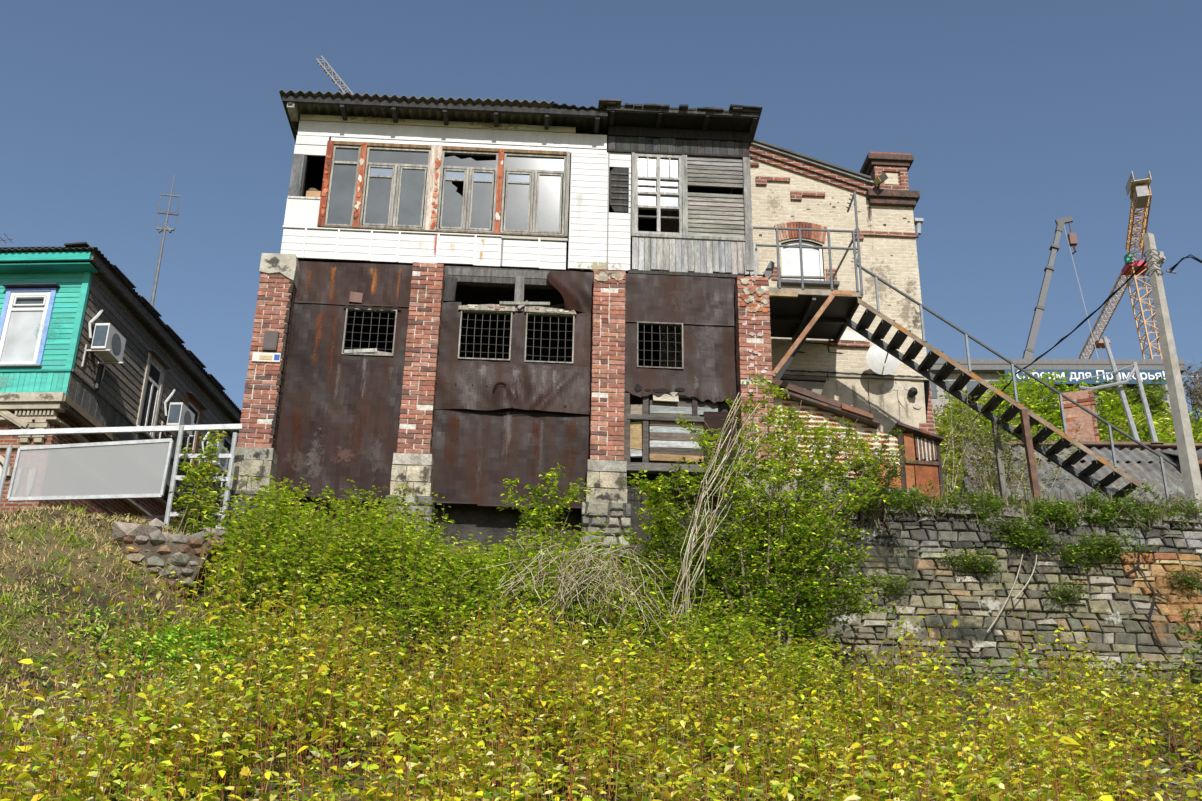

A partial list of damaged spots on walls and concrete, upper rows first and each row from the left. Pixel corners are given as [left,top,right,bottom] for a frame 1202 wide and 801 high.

peeling [430,157,441,229]